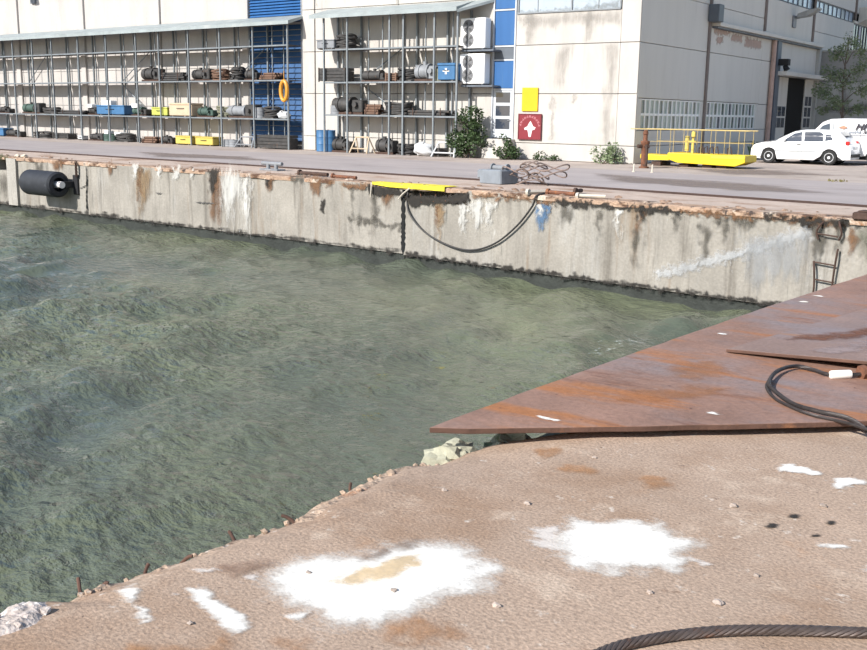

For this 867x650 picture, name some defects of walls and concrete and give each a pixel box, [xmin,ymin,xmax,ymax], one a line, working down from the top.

corrosion [136,169,150,203]
leakage [0,170,810,306]
spalling [71,462,440,602]